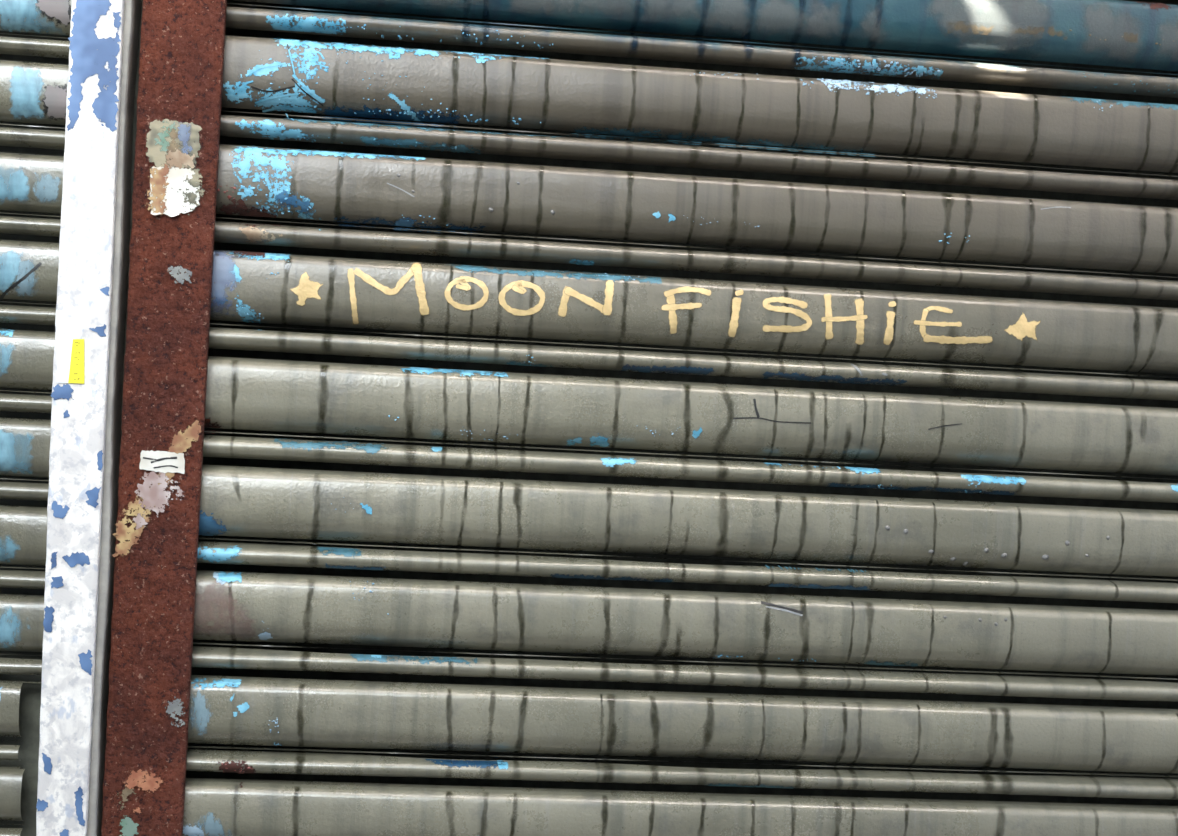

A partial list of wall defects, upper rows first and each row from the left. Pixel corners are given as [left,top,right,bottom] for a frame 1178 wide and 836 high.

peeling [0,0,121,132]
peeling [223,13,875,235]
peeling [0,171,59,202]
peeling [0,250,34,296]
peeling [51,384,74,418]
peeling [51,501,70,519]
peeling [85,487,101,508]
peeling [51,552,90,588]
peeling [43,606,55,633]
peeling [78,650,93,675]
peeling [42,753,52,774]
peeling [60,787,85,836]